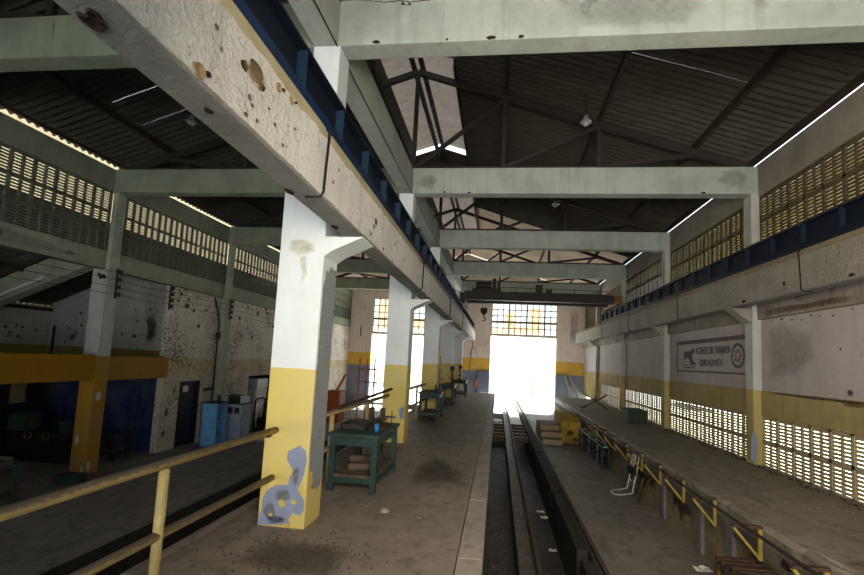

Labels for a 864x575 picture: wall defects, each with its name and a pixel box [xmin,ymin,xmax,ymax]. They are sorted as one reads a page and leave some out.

peeling [257,268,336,527]